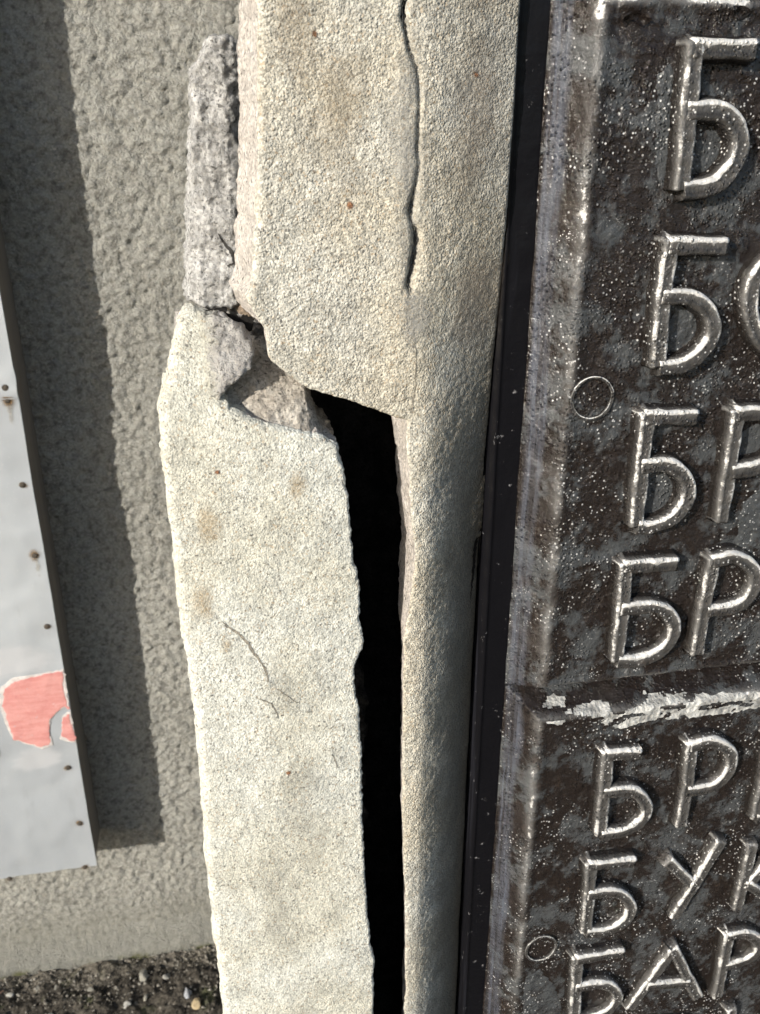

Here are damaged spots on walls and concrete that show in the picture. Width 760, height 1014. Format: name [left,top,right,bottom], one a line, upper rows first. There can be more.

spalling [182,0,334,435]
crack [246,412,341,459]
crack [391,0,420,1014]
crack [354,659,369,857]